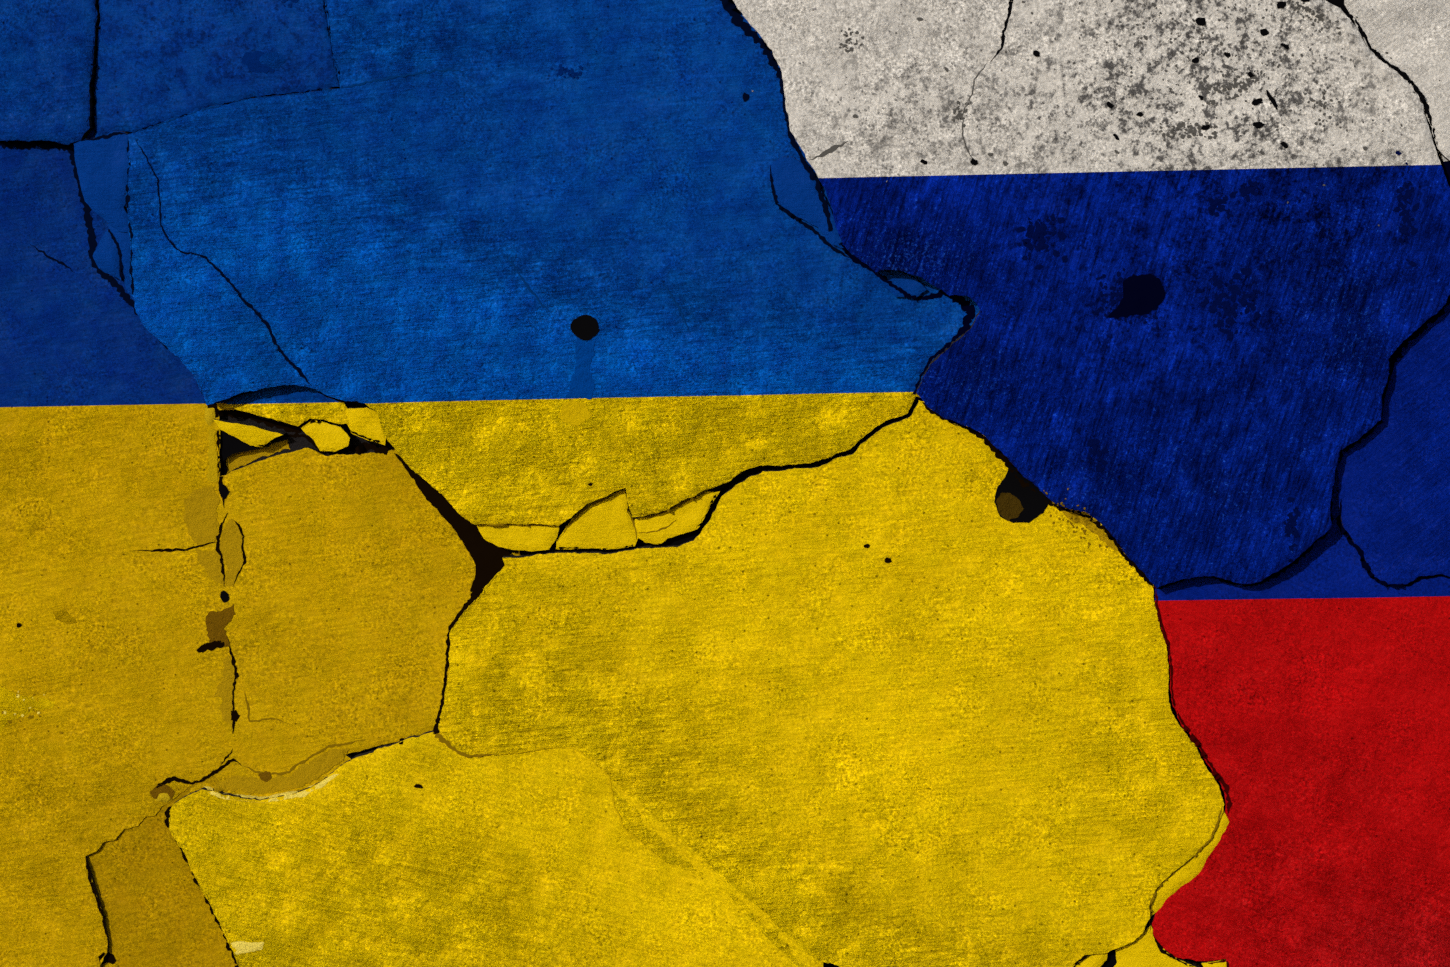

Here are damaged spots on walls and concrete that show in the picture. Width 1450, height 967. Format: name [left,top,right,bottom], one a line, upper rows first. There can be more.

crack [85,856,106,935]
crack [0,2,466,583]
crack [156,639,362,967]
flaking render [0,128,721,967]
crack [433,0,1450,967]